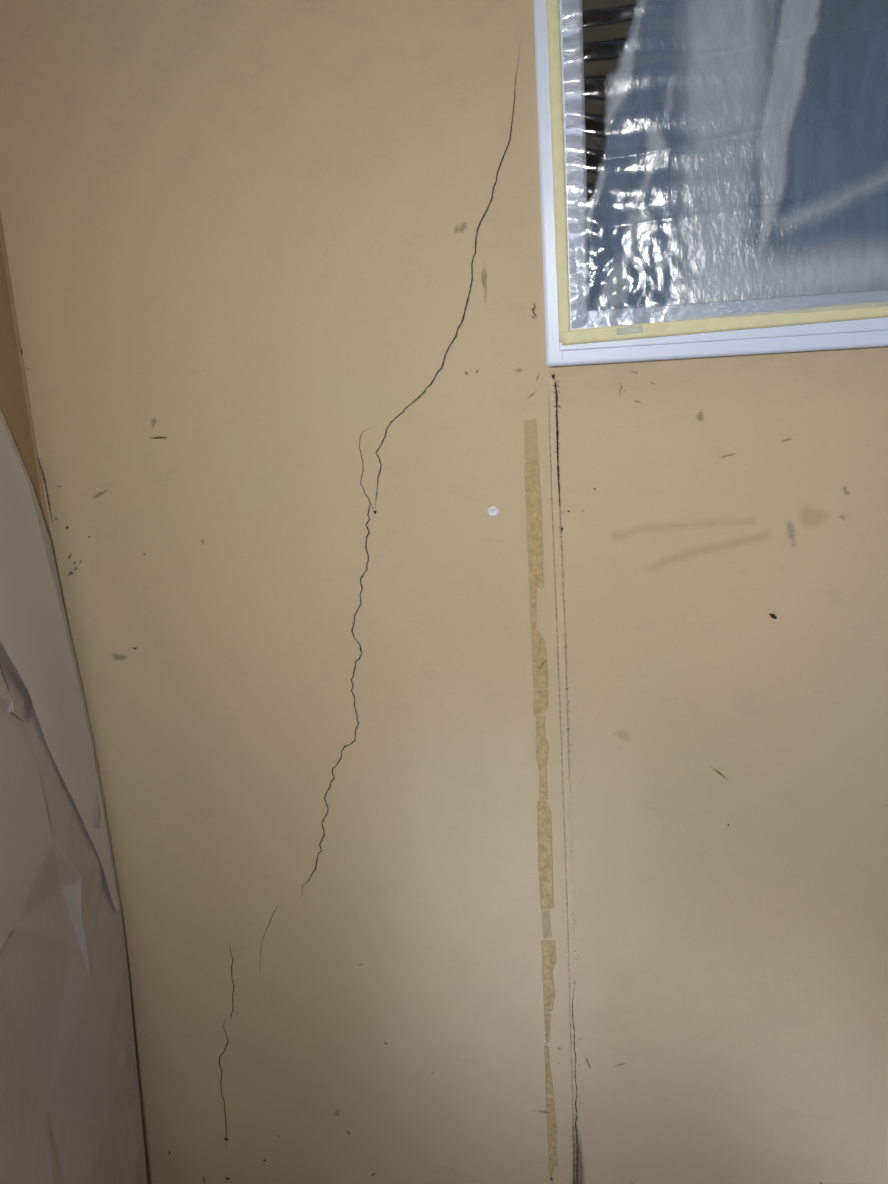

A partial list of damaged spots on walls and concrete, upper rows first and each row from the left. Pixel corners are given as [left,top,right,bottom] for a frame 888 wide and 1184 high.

crack [553,380,563,513]
crack [219,60,519,1143]
crack [572,981,581,1184]